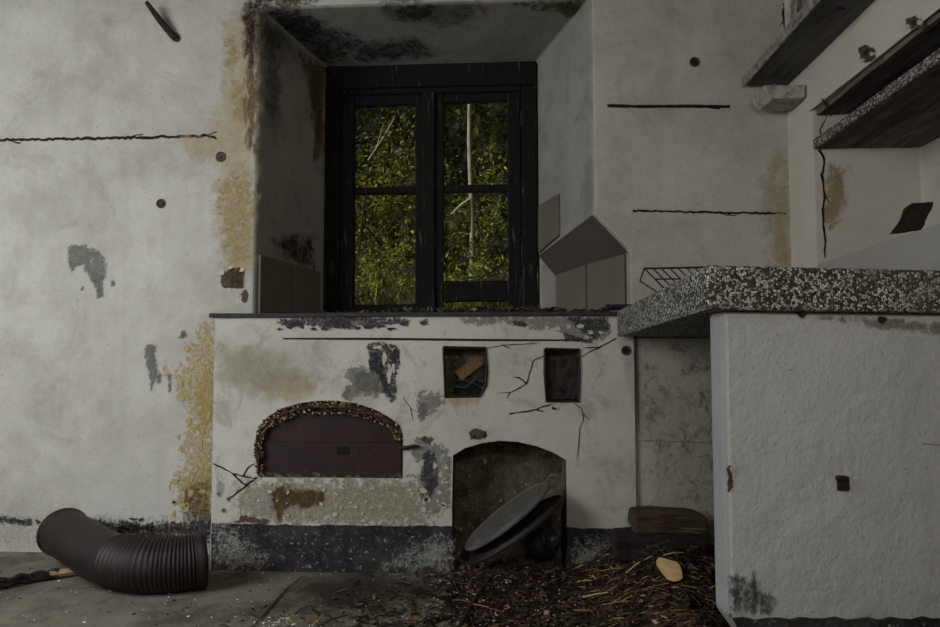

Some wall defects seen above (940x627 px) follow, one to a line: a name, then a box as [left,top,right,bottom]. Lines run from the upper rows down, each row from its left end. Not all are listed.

water stain [241,0,432,64]
crack [0,132,217,144]
crack [818,98,833,258]
spalling [219,266,248,303]
peeling [277,317,427,331]
crack [582,338,616,357]
crack [489,343,589,457]
spalling [91,321,452,546]
peeling [0,516,40,526]
water stain [729,574,774,617]